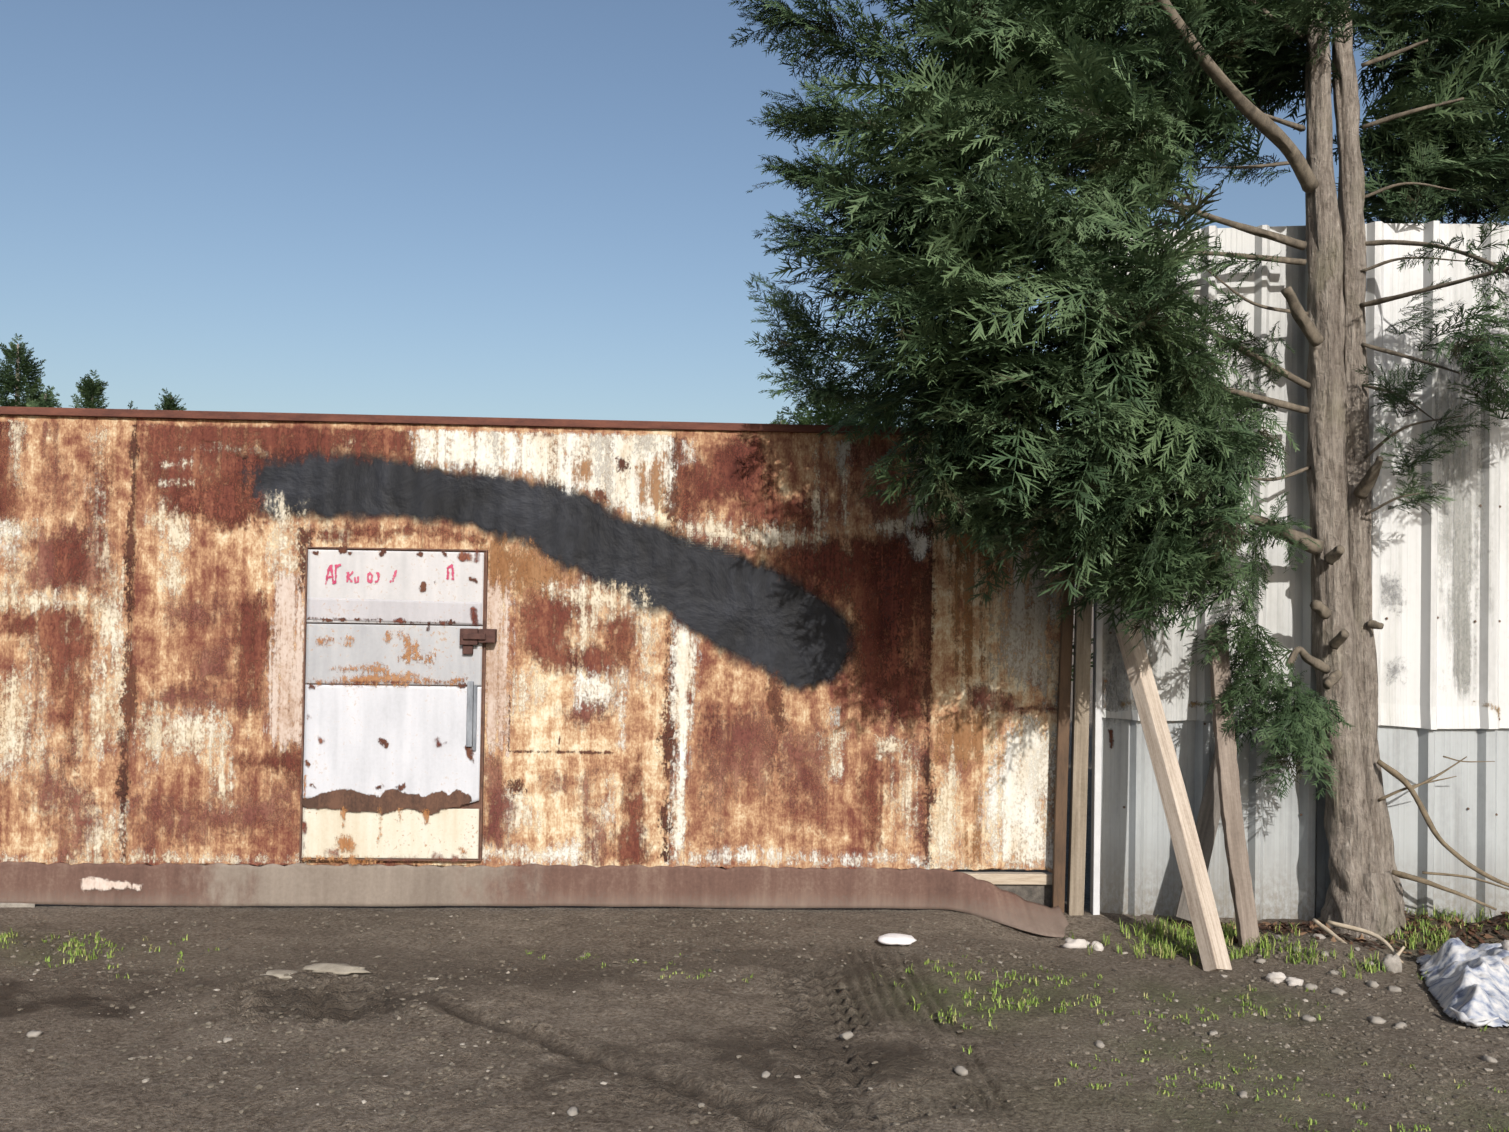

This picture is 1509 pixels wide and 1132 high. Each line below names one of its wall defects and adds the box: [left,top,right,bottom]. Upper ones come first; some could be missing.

corrosion [0,421,678,867]
corrosion [615,437,1055,867]